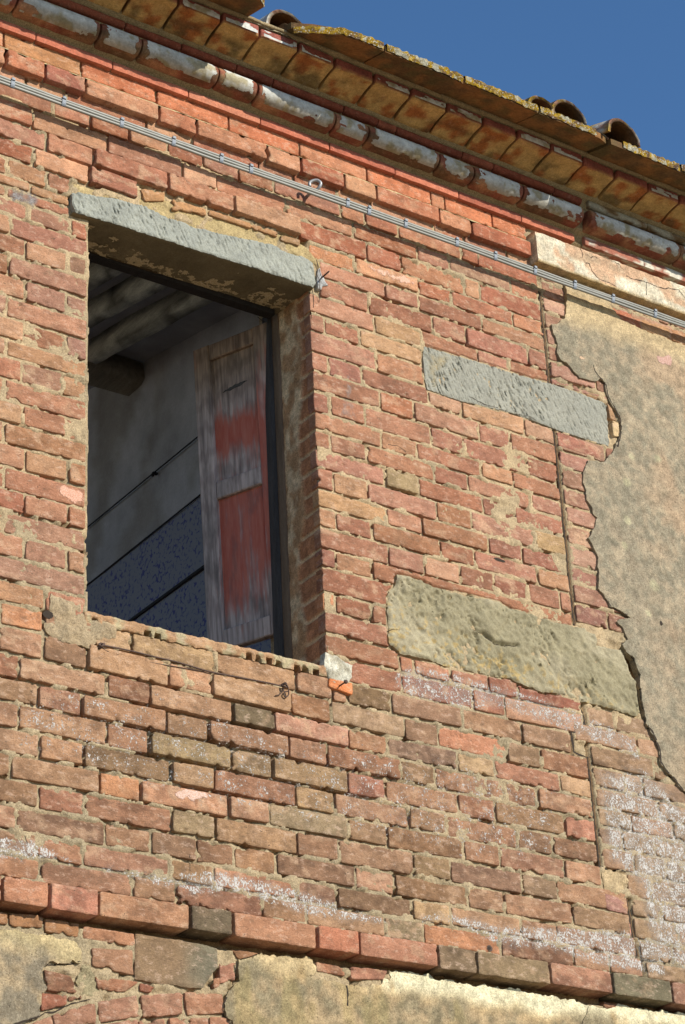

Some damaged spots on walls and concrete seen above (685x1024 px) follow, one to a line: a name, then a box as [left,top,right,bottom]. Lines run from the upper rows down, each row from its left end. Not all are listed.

crack [538,291,551,384]
crack [469,396,576,626]
flaking render [550,276,685,793]
crack [570,706,626,872]
flaking render [0,929,82,1024]
water stain [0,837,89,868]
water stain [104,868,385,923]
water stain [425,771,685,974]
crack [626,898,642,965]